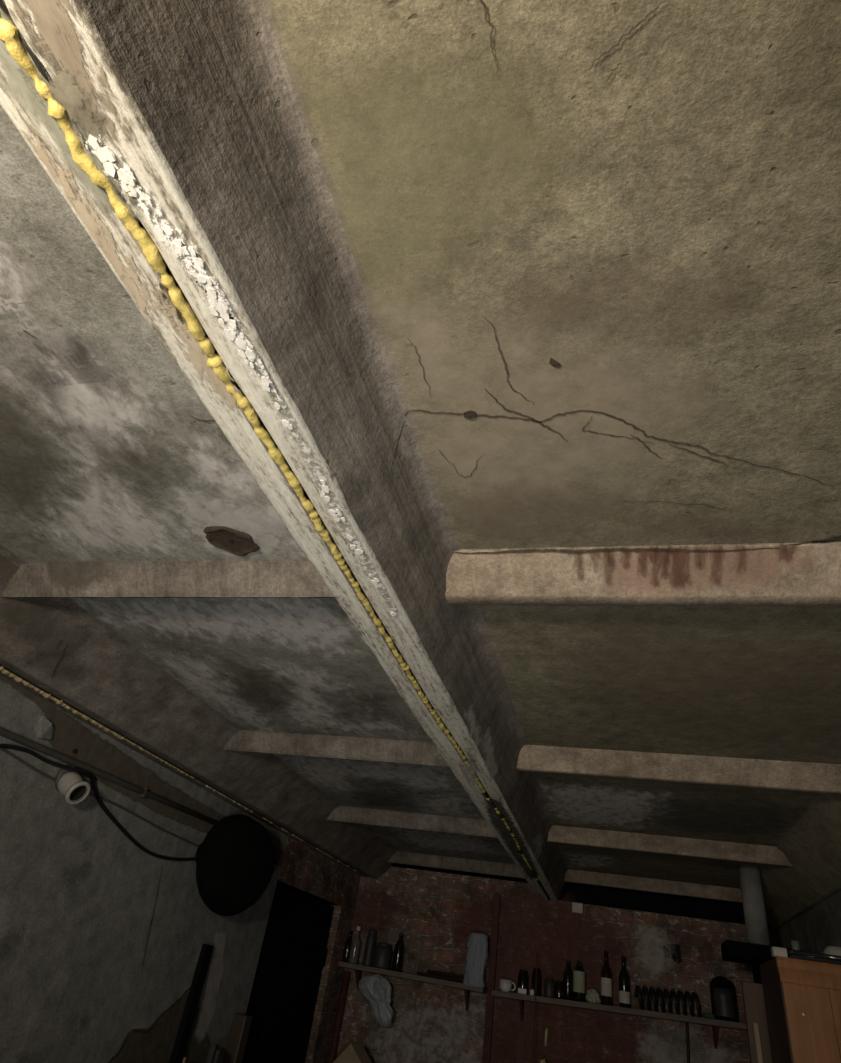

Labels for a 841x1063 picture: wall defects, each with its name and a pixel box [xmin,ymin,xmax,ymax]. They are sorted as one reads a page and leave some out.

crack [479,0,499,80]
crack [589,0,667,82]
peeling [0,0,397,616]
water stain [0,240,306,561]
crack [391,318,840,486]
crack [453,536,841,554]
corrosion [605,548,722,586]